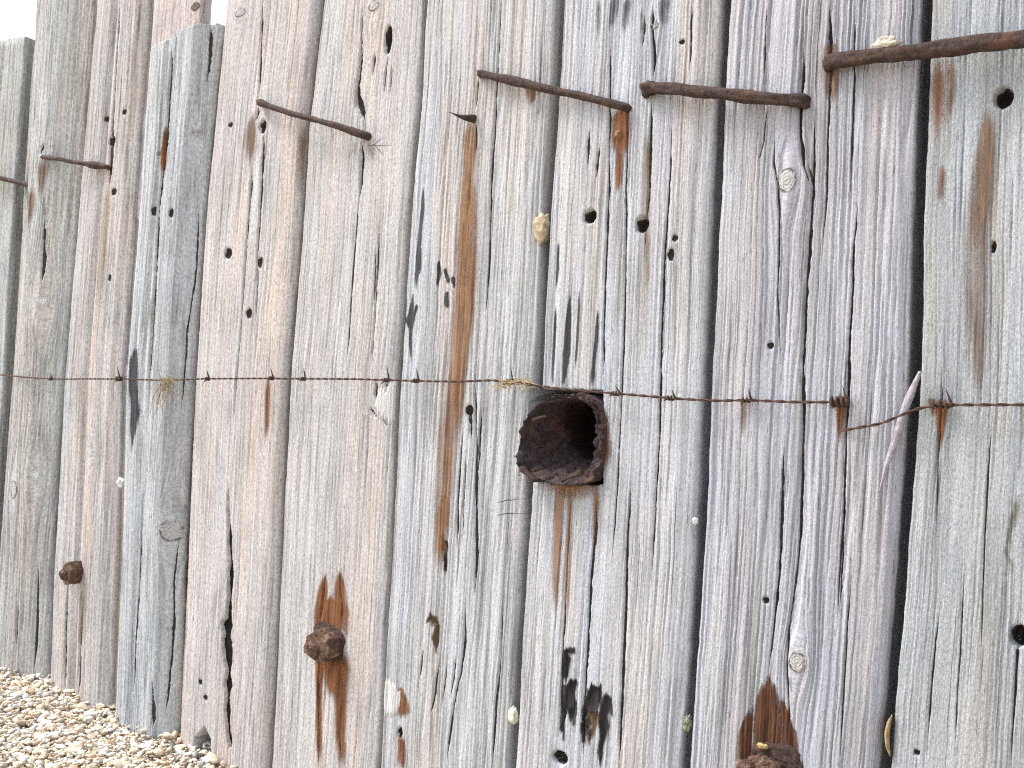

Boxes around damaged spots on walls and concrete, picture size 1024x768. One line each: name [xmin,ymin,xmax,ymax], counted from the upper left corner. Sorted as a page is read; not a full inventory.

rust [826,69,838,97]
rust [611,110,629,188]
rust [974,119,994,258]
rust [436,125,476,557]
rust [837,396,846,436]
rust [929,399,947,442]
rust [519,466,538,482]
rust [554,469,602,601]
crack [224,524,234,743]
rust [315,573,349,631]
rust [315,657,348,758]
rust [736,677,798,760]